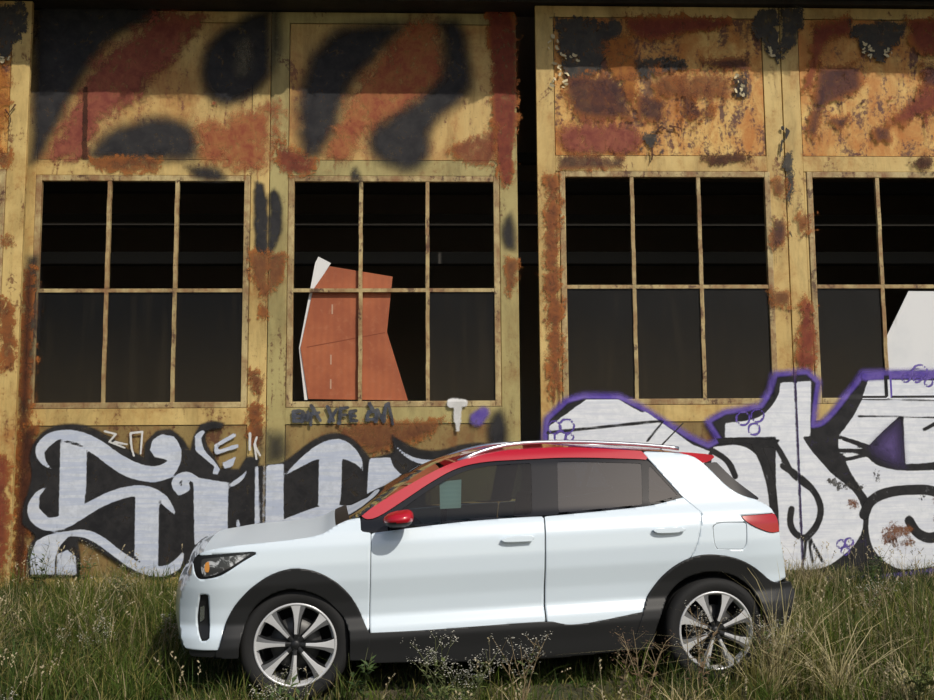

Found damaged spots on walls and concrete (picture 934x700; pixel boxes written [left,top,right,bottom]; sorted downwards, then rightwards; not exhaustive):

rust [0,63,14,170]
peeling [0,1,34,64]
peeling [547,13,623,88]
peeling [733,73,750,102]
rust [804,57,868,140]
peeling [843,19,907,64]
rust [871,59,934,146]
rust [538,32,752,403]
rust [0,294,20,375]
rust [765,285,819,372]
rust [0,454,17,582]